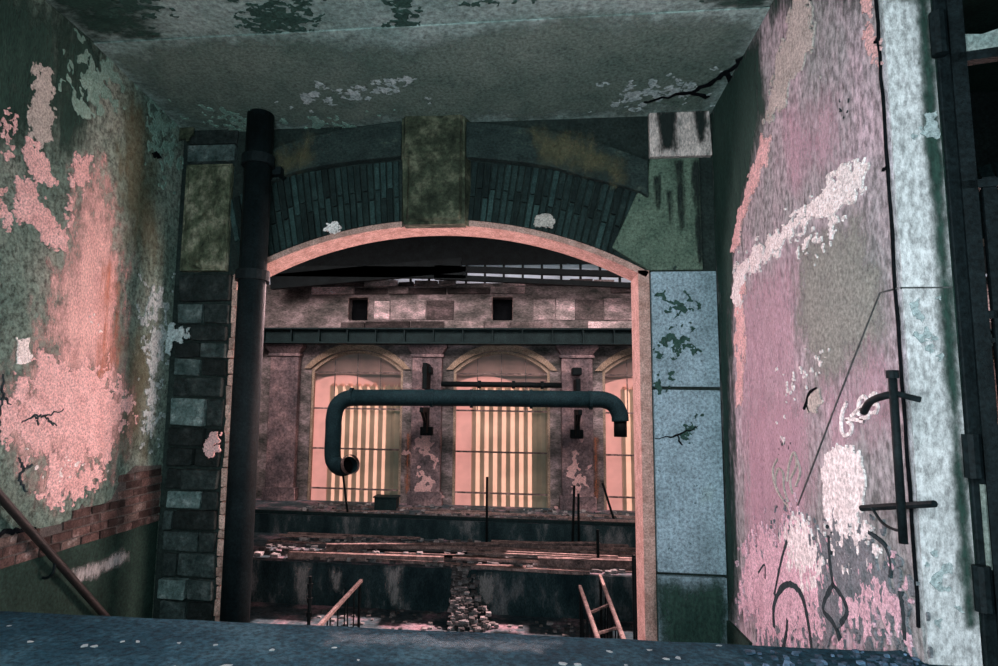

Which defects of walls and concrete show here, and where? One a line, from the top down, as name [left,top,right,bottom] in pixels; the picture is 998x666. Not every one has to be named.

crack [643,56,743,103]
leakage [704,0,793,20]
peeling [860,0,884,67]
peeling [730,0,870,413]
peeling [0,28,191,569]
leakage [0,0,765,644]
leakage [797,217,884,383]
leakage [918,0,976,628]
crack [0,374,64,492]
spalling [401,435,439,492]
spalling [566,438,592,497]
spalling [734,443,953,666]